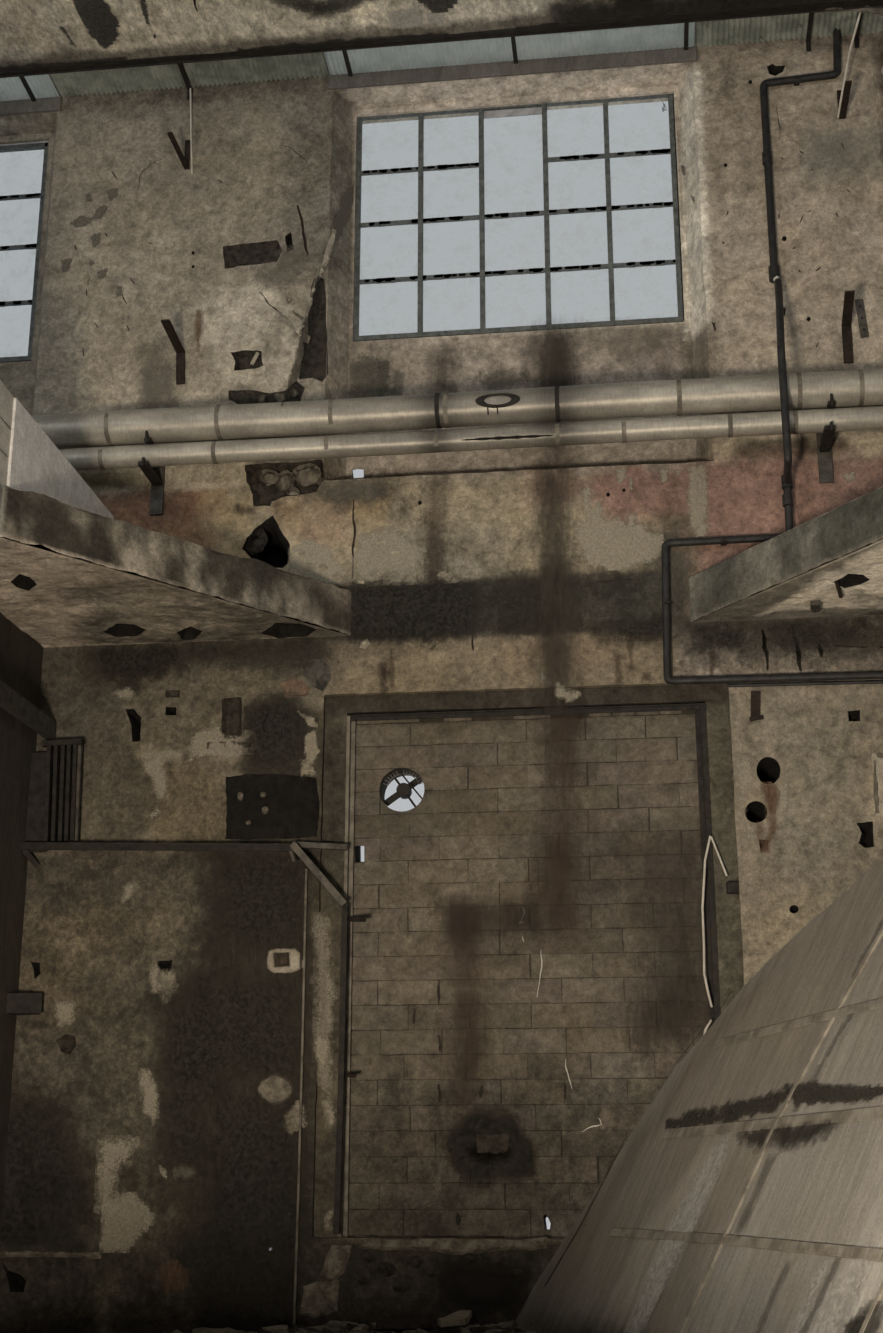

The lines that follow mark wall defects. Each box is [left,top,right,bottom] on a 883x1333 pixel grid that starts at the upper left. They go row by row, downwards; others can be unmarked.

peeling [228,184,354,406]
peeling [242,459,481,585]
damp [540,670,579,701]
rust [758,782,778,851]